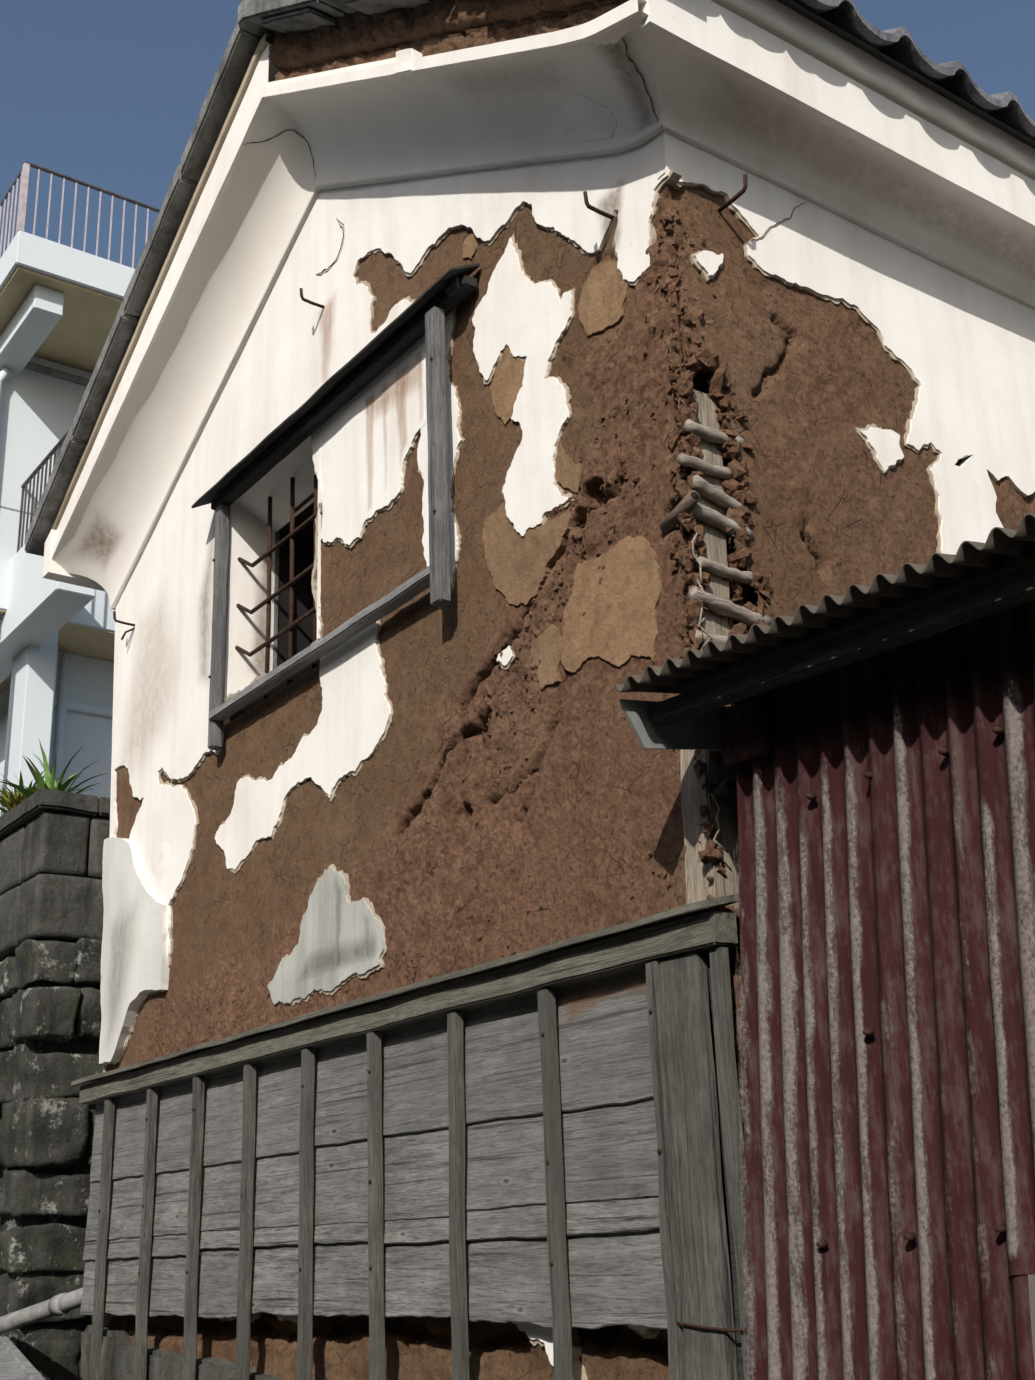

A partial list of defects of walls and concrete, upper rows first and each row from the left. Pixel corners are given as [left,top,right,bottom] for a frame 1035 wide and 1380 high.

crack [622,38,658,123]
crack [244,130,316,180]
crack [316,218,344,275]
spalling [988,475,1035,530]
crack [485,603,533,679]
crack [421,730,488,811]
spalling [103,184,938,1380]
crack [508,763,542,793]
peeling [1002,674,1035,1173]
peeling [981,804,1019,1257]